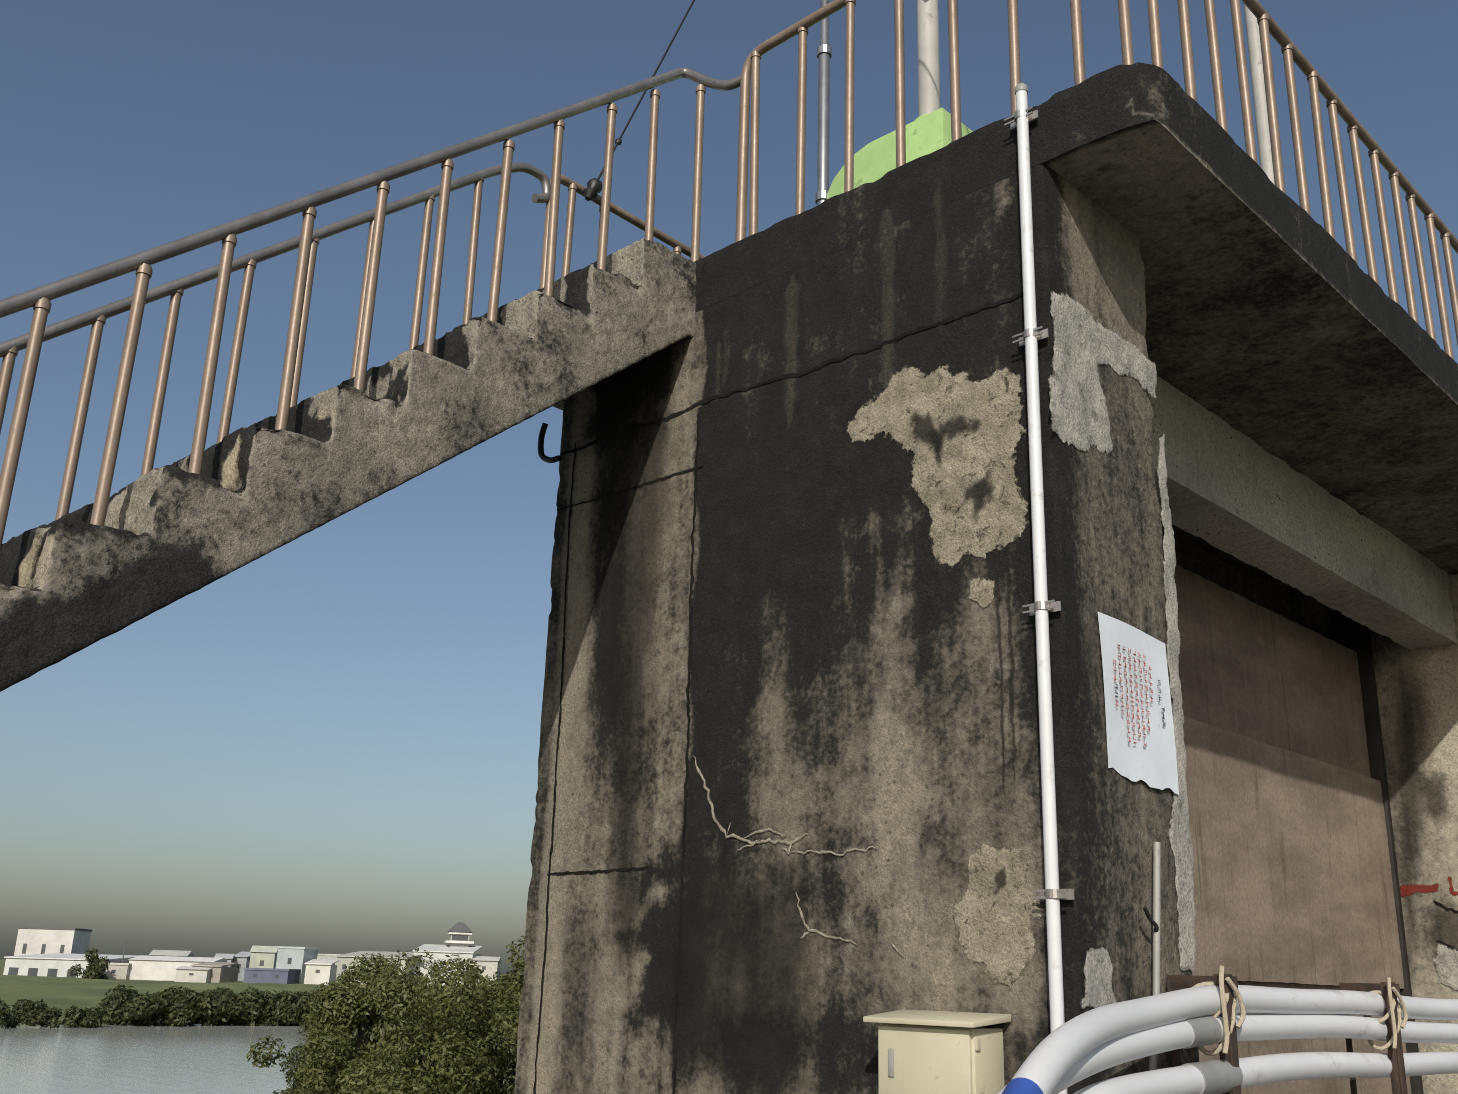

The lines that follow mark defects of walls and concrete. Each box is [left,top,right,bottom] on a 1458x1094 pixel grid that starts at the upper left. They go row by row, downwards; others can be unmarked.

peeling [847,365,1028,566]
peeling [1048,292,1157,453]
leakage [608,398,663,921]
crack [533,291,1023,1094]
peeling [969,577,995,608]
leakage [996,545,1015,798]
leakage [673,873,808,1078]
peeling [953,843,1046,990]